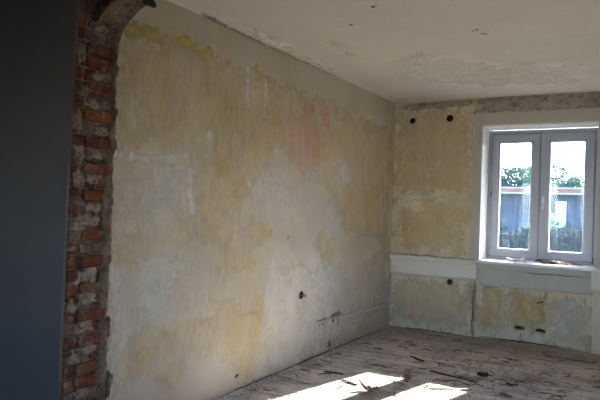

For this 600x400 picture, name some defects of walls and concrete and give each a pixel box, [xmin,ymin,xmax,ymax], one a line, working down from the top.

flaking render [61,0,164,400]
peeling [393,91,600,202]